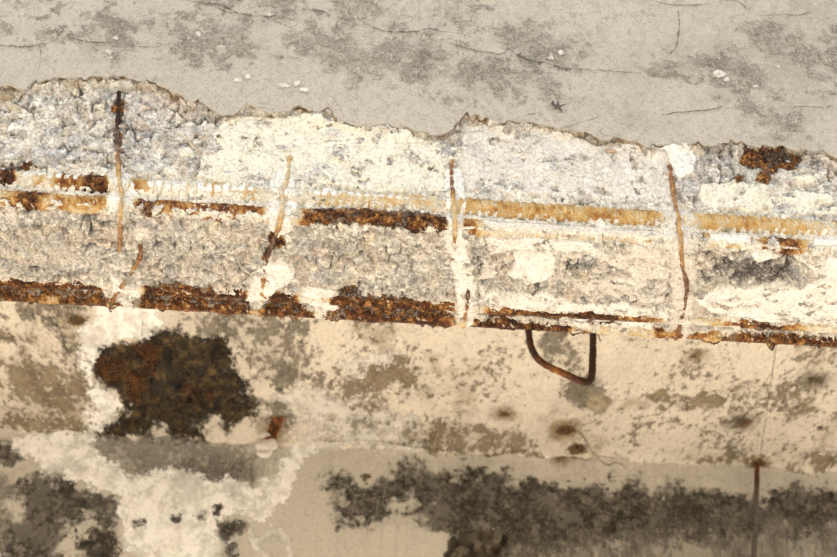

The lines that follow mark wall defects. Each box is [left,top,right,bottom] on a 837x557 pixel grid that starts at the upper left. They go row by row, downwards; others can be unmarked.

crack [0,38,169,52]
crack [203,2,294,17]
crack [659,2,702,53]
rust [730,143,802,185]
rust [303,197,446,229]
spalling [0,75,837,341]
rust [0,281,122,312]
rust [132,281,251,318]
rust [261,285,455,329]
rust [694,320,837,351]
rust [84,323,272,447]
water stain [0,253,837,557]